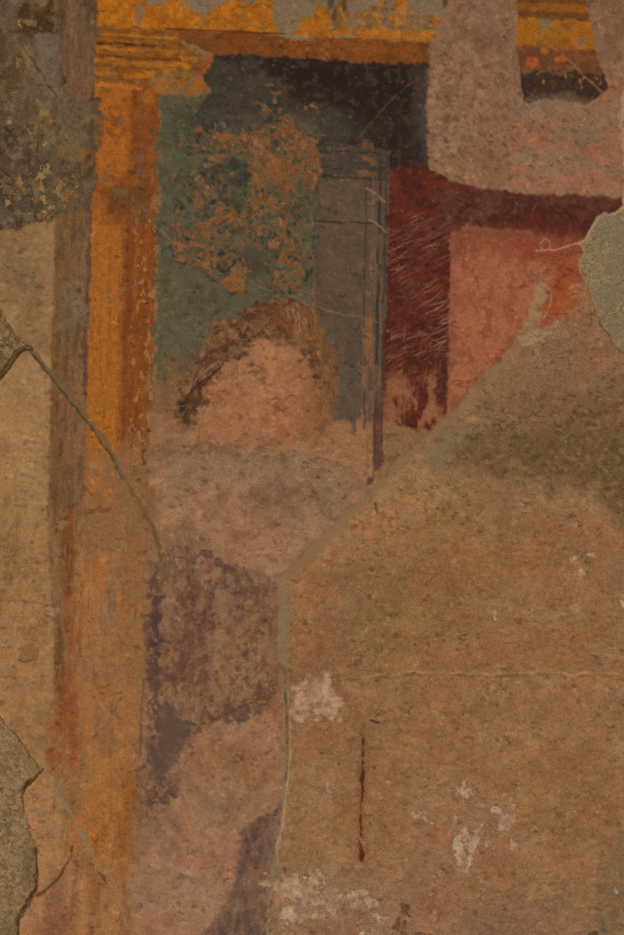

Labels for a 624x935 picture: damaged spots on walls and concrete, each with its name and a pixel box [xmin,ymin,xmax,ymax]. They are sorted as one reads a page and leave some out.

crack [534,34,624,167]
crack [535,239,582,253]
crack [26,344,177,667]
crack [264,339,521,935]
efflorescence [286,668,346,724]
crack [331,673,624,683]
crack [36,716,131,931]
efflorescence [455,780,476,802]
efflorescence [447,804,527,874]
efflorescence [259,869,388,935]